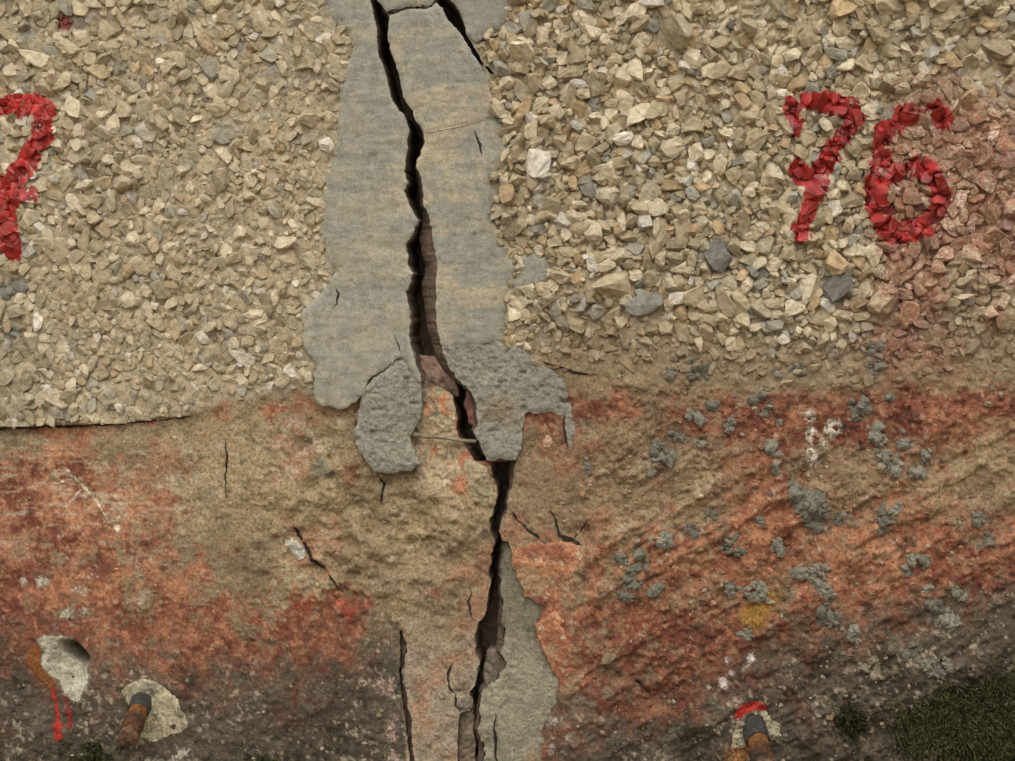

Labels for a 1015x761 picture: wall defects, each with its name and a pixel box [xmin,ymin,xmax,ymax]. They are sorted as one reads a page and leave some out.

crack [370,0,597,761]
corrosion [739,591,782,632]
spalling [36,635,90,702]